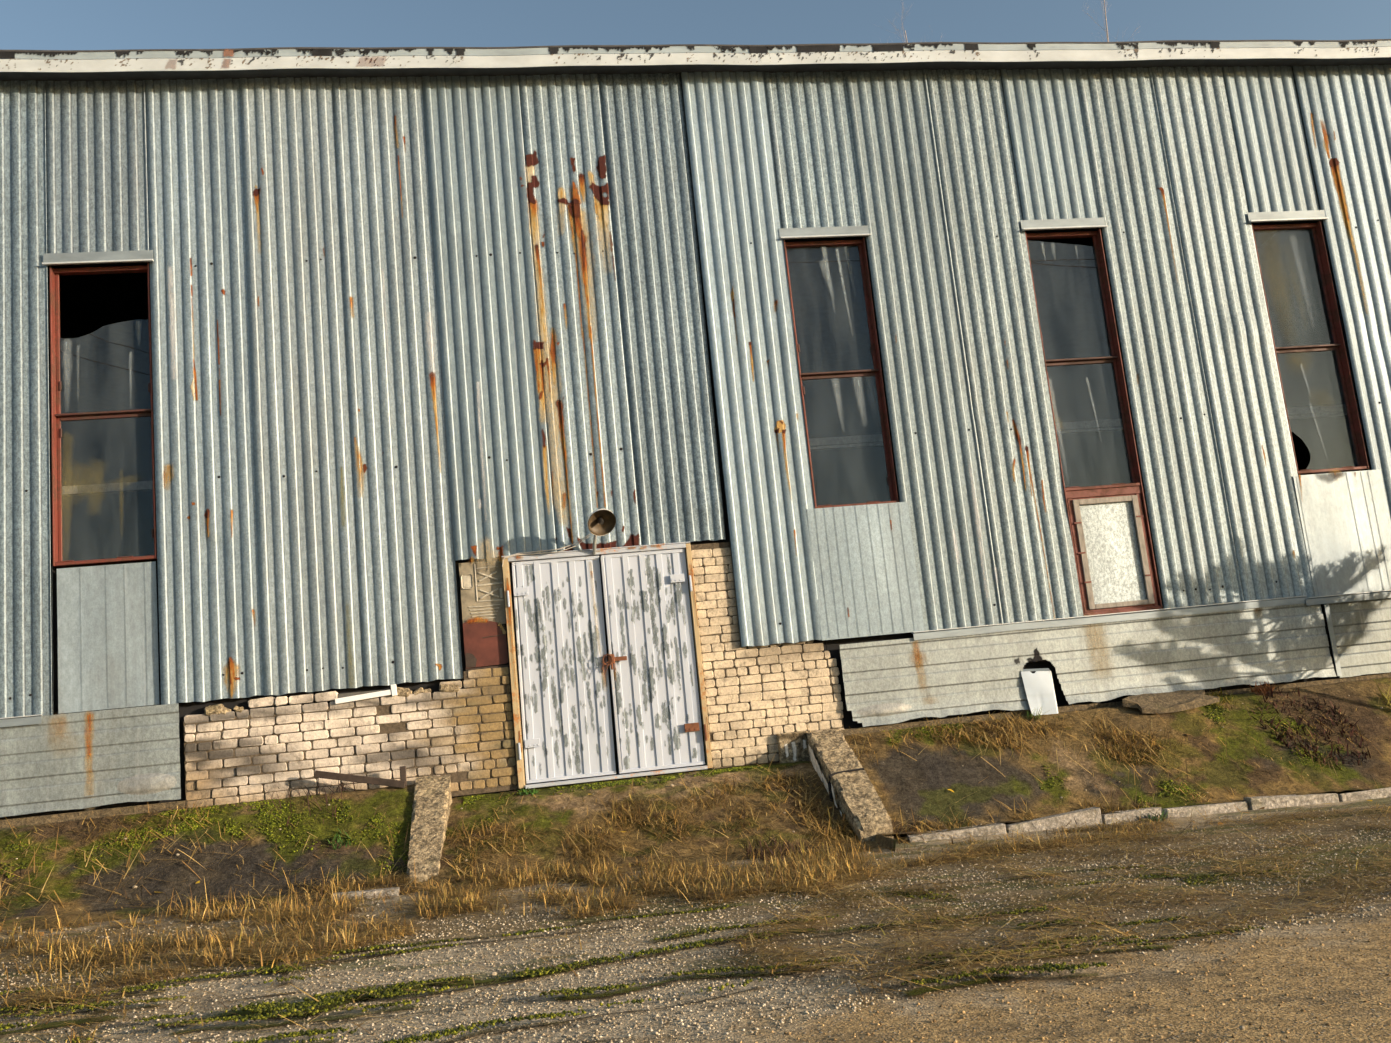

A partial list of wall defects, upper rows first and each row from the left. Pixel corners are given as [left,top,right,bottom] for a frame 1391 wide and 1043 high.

peeling [0,51,77,70]
peeling [175,48,465,69]
peeling [549,43,980,64]
peeling [1156,42,1220,57]
peeling [1340,41,1379,56]
rust [1311,113,1364,295]
rust [520,151,616,544]
rust [430,372,441,468]
rust [774,414,798,492]
rust [1006,412,1055,619]
rust [225,658,240,697]
peeling [516,526,697,774]